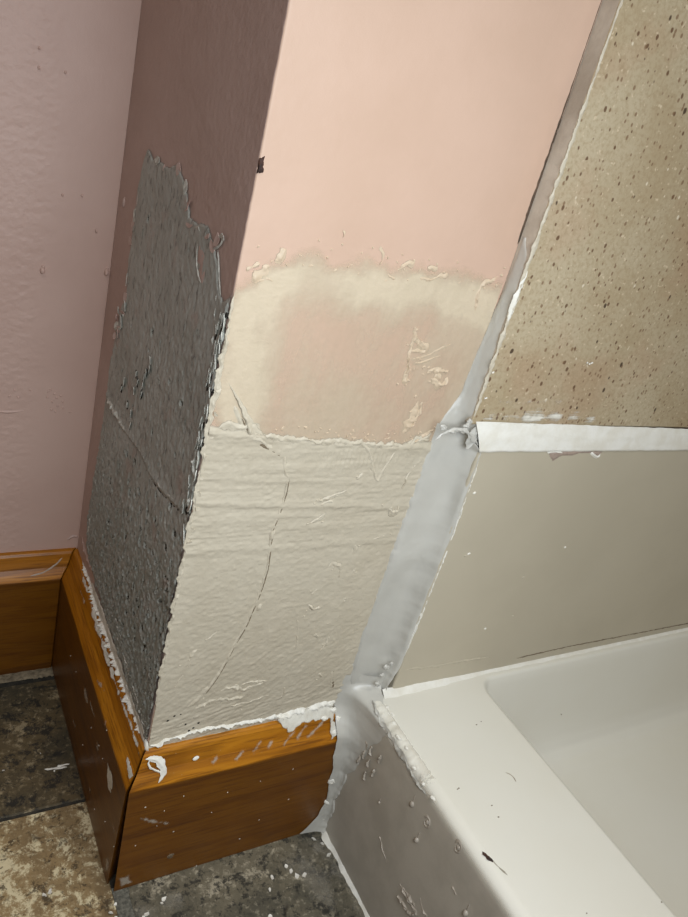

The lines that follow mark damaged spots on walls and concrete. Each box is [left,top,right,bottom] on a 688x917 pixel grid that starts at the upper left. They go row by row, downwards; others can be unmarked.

crack [106,398,180,510]
peeling [86,149,235,739]
crack [186,480,290,708]